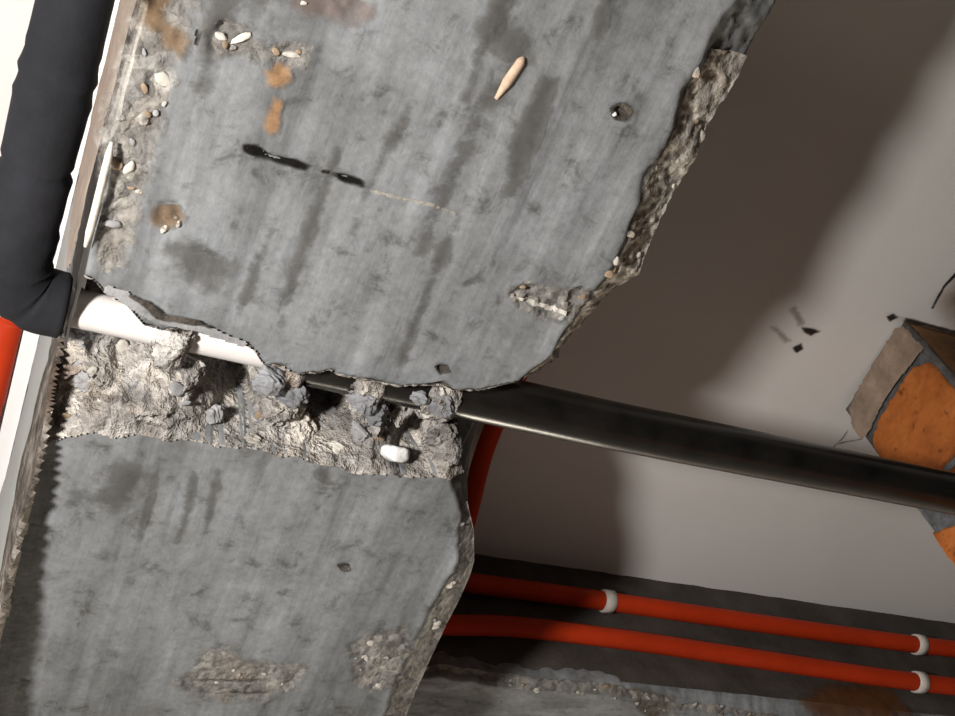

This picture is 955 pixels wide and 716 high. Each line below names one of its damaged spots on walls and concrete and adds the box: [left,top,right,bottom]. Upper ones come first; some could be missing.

rust [266,64,291,87]
rust [264,100,282,133]
crack [321,169,338,177]
crack [373,190,454,213]
spalling [0,0,747,646]
crack [904,273,955,334]
spalling [348,501,777,716]
spalling [173,646,307,703]